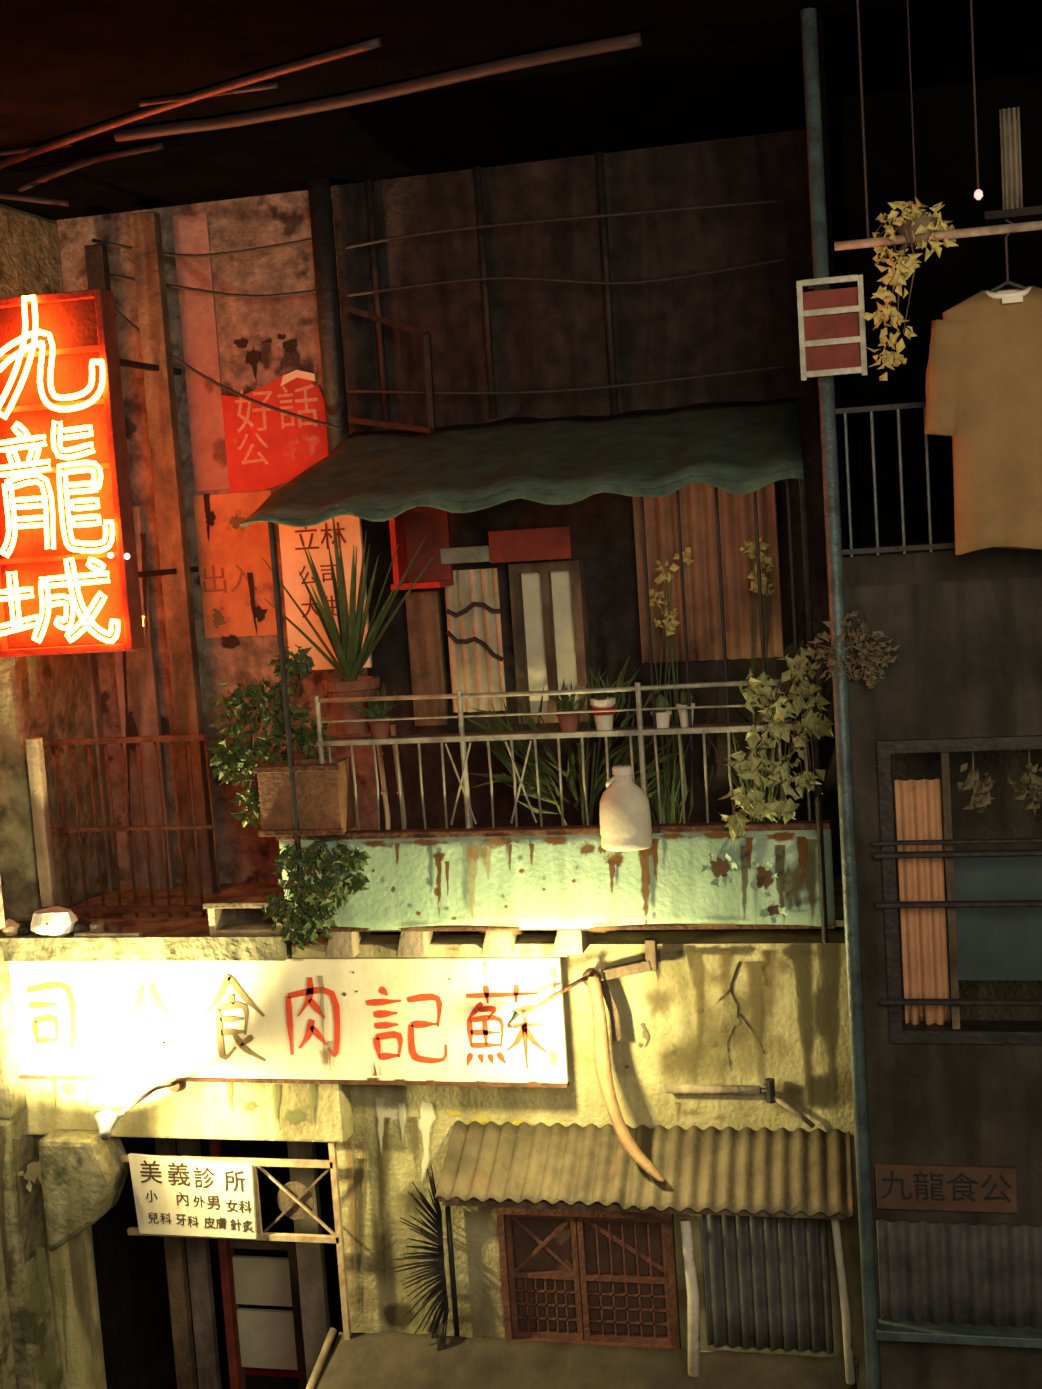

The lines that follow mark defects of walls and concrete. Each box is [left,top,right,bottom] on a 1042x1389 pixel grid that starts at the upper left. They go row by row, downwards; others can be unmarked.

rust [364,833,685,927]
rust [703,830,808,883]
crack [720,961,765,1069]